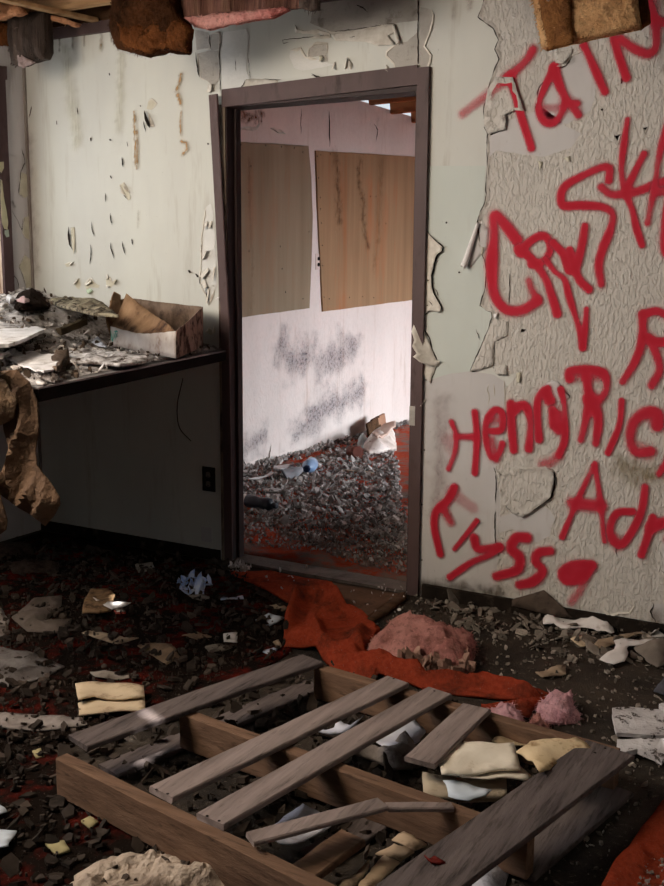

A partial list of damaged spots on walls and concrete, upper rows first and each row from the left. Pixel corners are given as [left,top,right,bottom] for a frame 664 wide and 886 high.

peeling [195,29,249,93]
peeling [284,0,434,71]
peeling [554,49,573,64]
spalling [144,98,157,128]
peeling [461,0,524,269]
peeling [119,182,131,200]
spalling [65,227,75,267]
peeling [73,274,117,294]
peeling [199,204,219,306]
peeling [425,231,444,315]
peeling [411,325,440,383]
peeling [470,276,521,406]